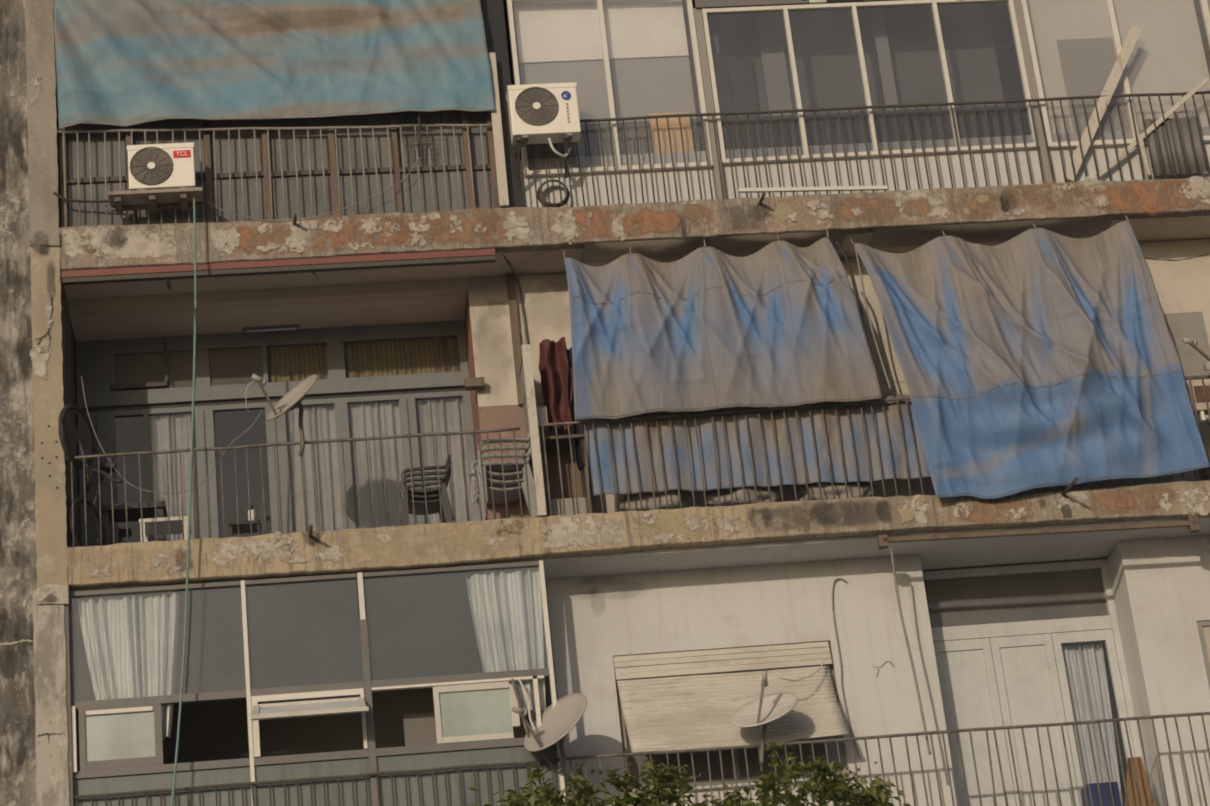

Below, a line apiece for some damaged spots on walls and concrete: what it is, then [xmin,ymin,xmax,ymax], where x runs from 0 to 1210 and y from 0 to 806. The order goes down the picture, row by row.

damp [0,73,29,236]
peeling [786,171,1210,228]
peeling [61,226,180,260]
peeling [210,212,441,256]
damp [0,258,32,383]
peeling [30,345,49,380]
damp [0,399,33,465]
damp [757,501,889,529]
peeling [897,495,928,524]
spalling [1040,491,1088,518]
peeling [211,529,409,567]
damp [0,491,34,676]